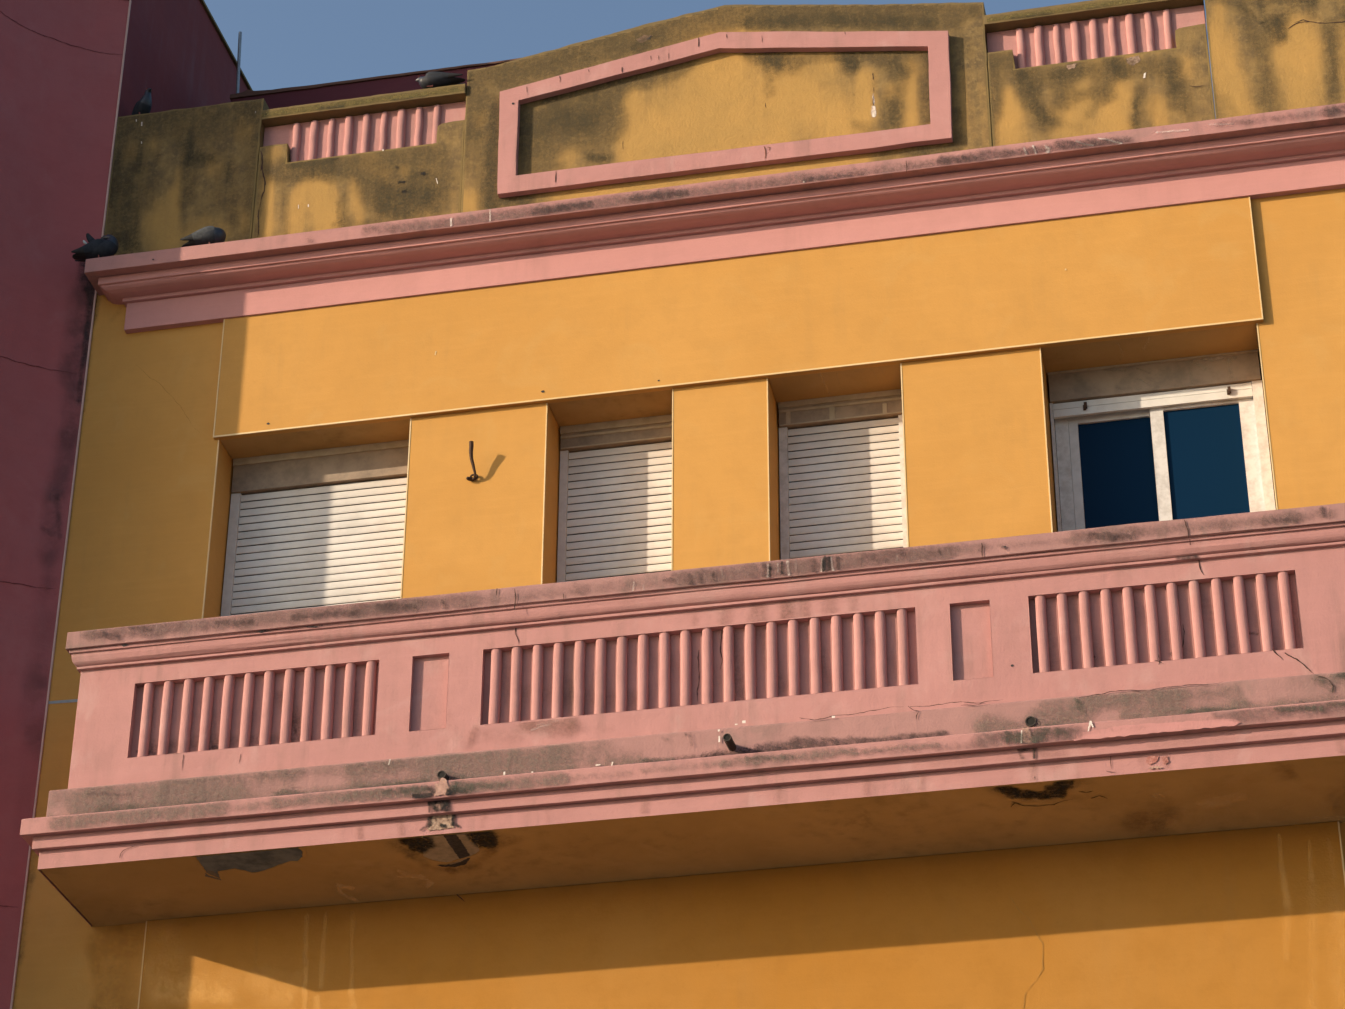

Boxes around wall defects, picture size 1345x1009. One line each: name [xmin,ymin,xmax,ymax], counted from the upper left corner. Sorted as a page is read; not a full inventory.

crack [1288,19,1345,29]
leakage [110,0,1150,239]
leakage [82,262,95,366]
leakage [812,556,840,572]
crack [1272,649,1334,693]
leakage [976,688,1295,759]
leakage [591,731,947,766]
leakage [65,775,249,814]
leakage [277,744,575,853]
leakage [995,777,1074,800]
spalling [193,847,307,880]